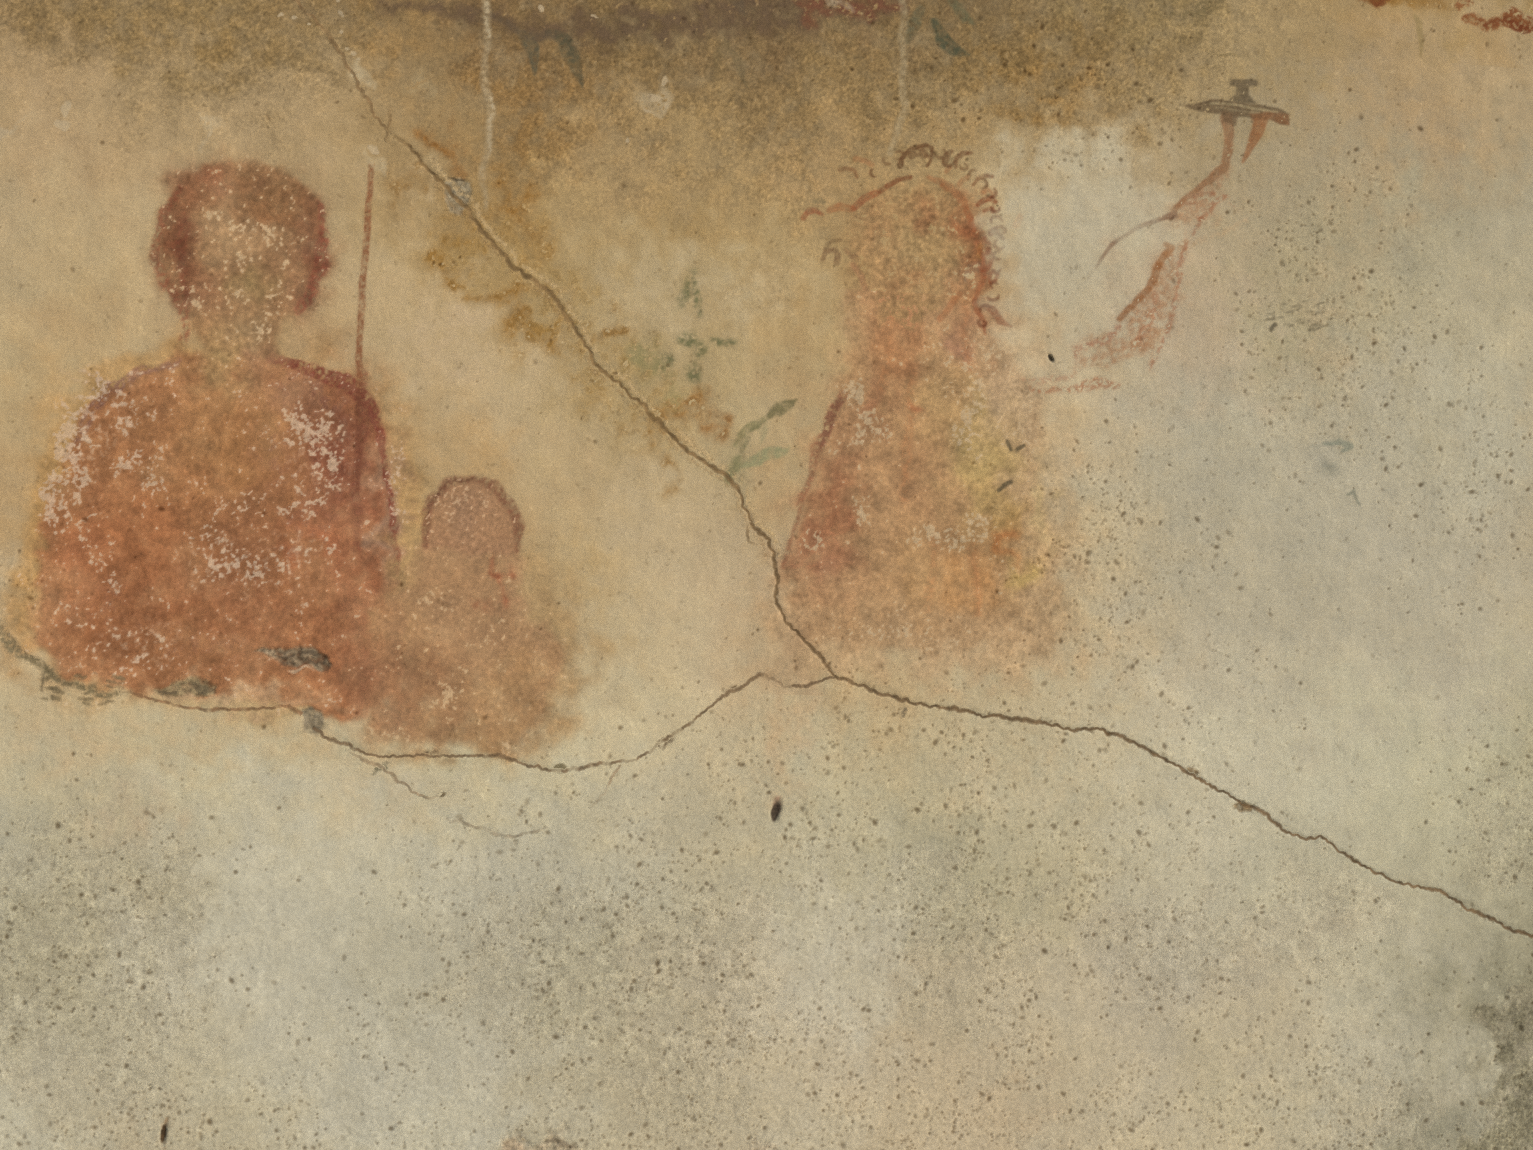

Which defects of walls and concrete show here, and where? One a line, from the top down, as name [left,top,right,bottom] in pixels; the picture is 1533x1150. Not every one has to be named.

crack [0,614,303,716]
crack [291,0,1533,939]